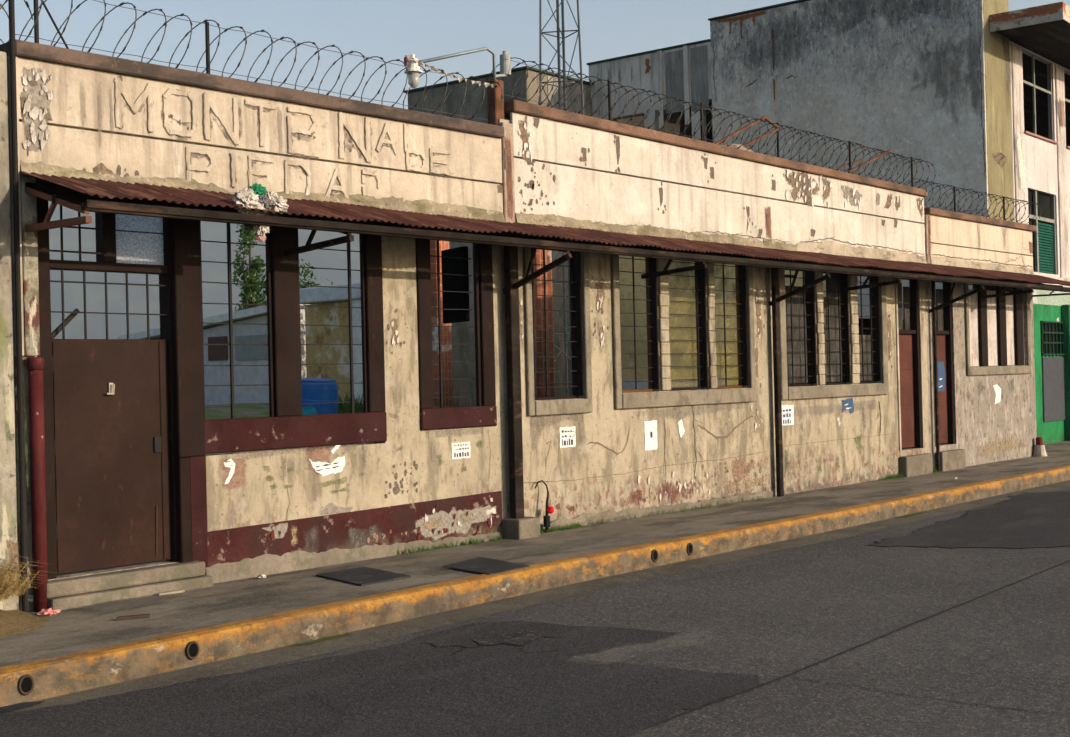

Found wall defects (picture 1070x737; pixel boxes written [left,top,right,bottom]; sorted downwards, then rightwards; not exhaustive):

corrosion [717,11,765,38]
peeling [20,68,54,154]
spalling [515,116,1034,275]
flaking render [206,498,501,584]